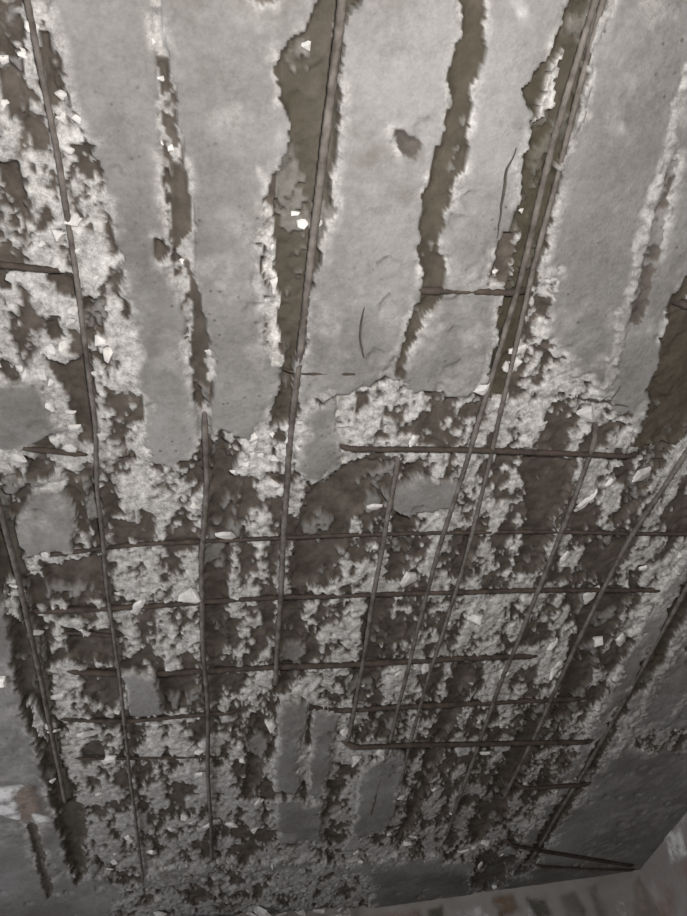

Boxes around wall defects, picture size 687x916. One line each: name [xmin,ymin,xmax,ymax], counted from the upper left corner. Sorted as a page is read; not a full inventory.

spalling [0,0,337,610]
spalling [308,83,344,307]
spalling [338,0,363,76]
spalling [394,130,424,163]
spalling [417,0,489,288]
spalling [488,0,610,289]
spalling [279,159,687,740]
spalling [0,523,561,916]
spalling [515,745,582,786]
spalling [531,786,588,850]
spalling [574,593,687,783]